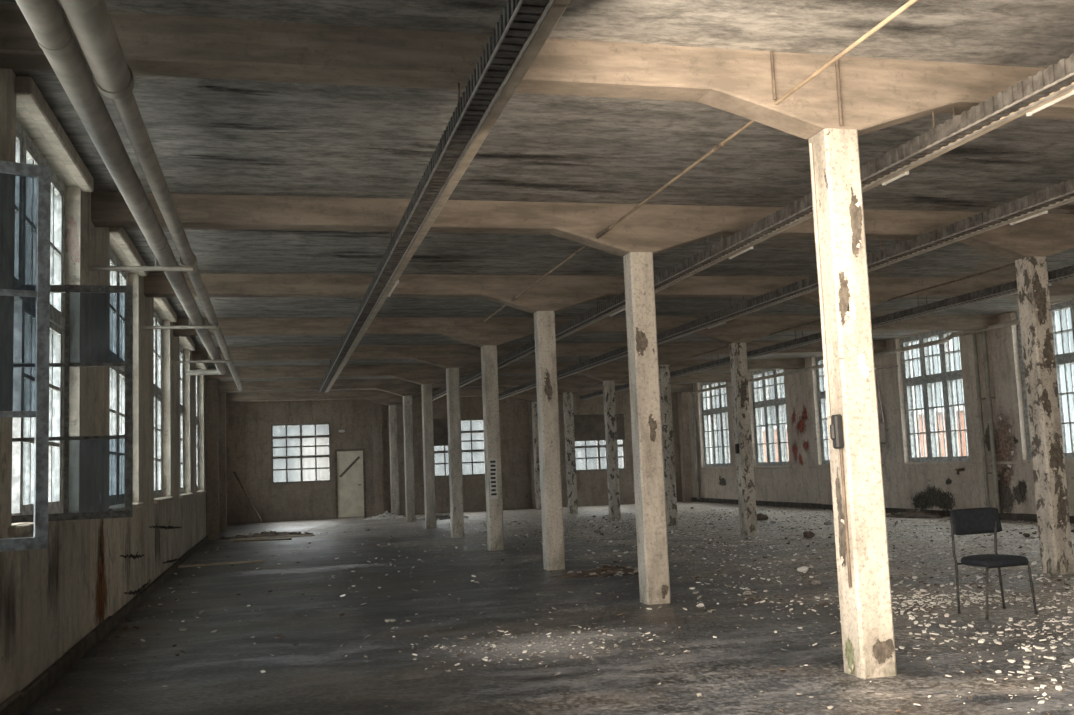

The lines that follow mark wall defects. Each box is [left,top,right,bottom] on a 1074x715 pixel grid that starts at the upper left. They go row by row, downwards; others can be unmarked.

peeling [849,187,862,257]
peeling [838,270,857,326]
peeling [1032,271,1054,372]
peeling [1042,389,1052,419]
spalling [984,414,1015,488]
peeling [1049,440,1067,526]